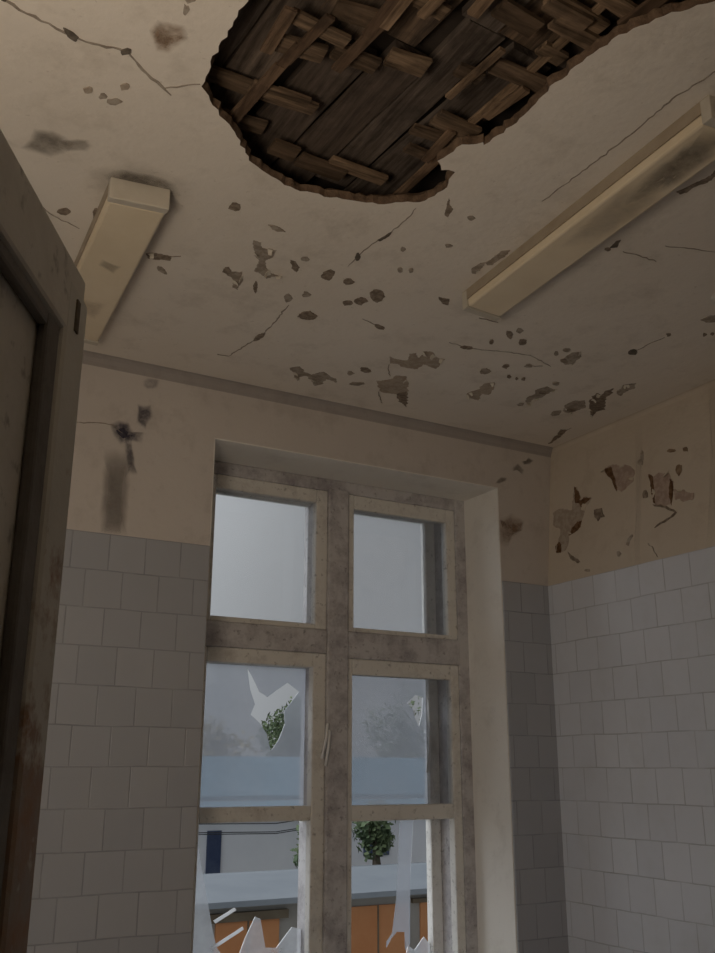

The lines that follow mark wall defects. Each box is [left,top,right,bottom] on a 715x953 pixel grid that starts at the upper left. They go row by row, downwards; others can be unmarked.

crack [2,0,200,96]
crack [543,71,715,201]
crack [217,305,289,357]
peeling [222,240,310,294]
peeling [297,311,317,320]
peeling [321,269,355,285]
peeling [343,289,385,306]
peeling [290,366,337,386]
peeling [347,351,445,407]
water stain [106,407,150,515]
peeling [600,450,694,528]
peeling [553,487,604,572]